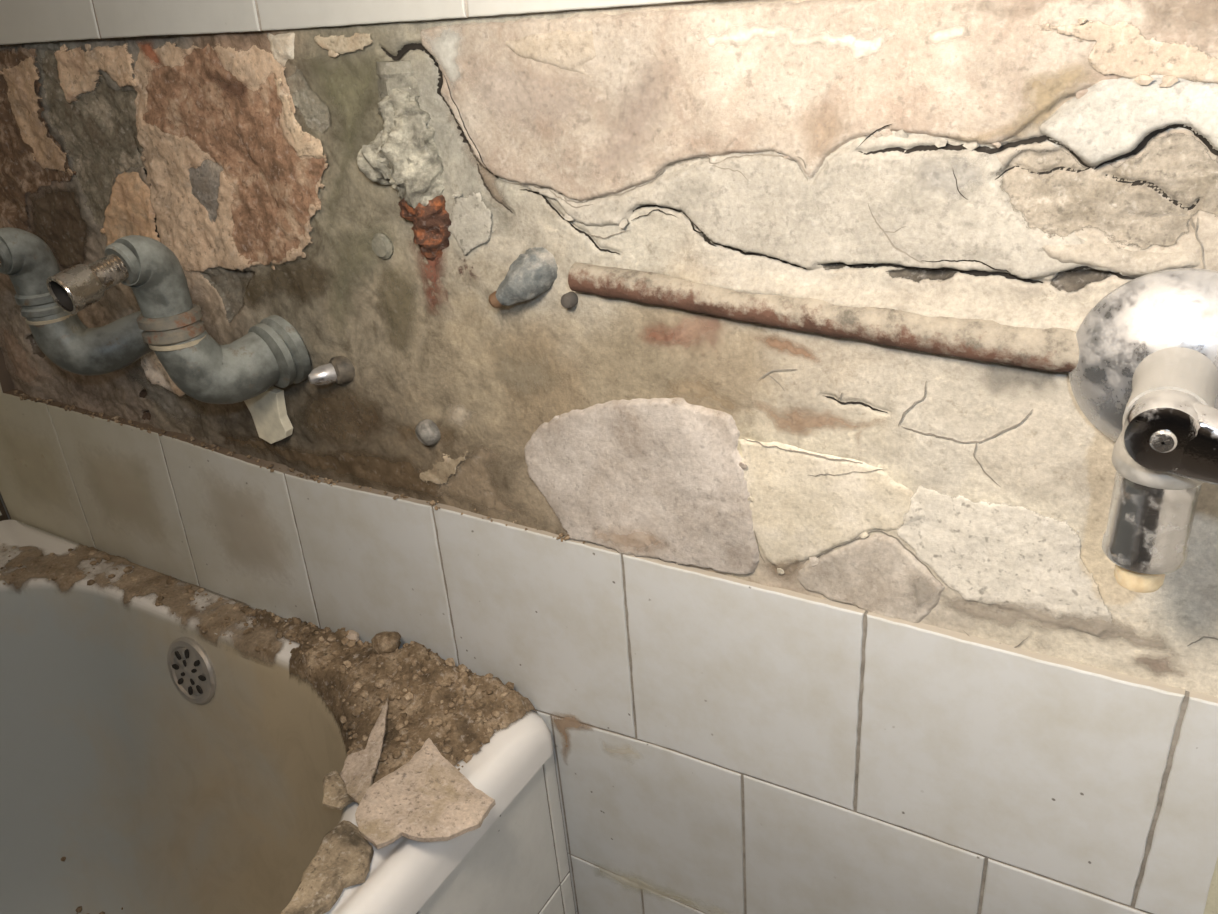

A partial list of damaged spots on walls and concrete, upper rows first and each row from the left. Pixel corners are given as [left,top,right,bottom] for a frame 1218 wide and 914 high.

peeling [314,32,373,58]
spalling [0,33,331,323]
corrosion [398,195,452,307]
crack [381,43,1136,283]
peeling [420,0,1218,292]
crack [858,124,1218,268]
peeling [141,351,185,397]
corrosion [765,337,813,359]
peeling [419,451,468,484]
peeling [524,397,1112,636]
crack [822,382,1033,486]